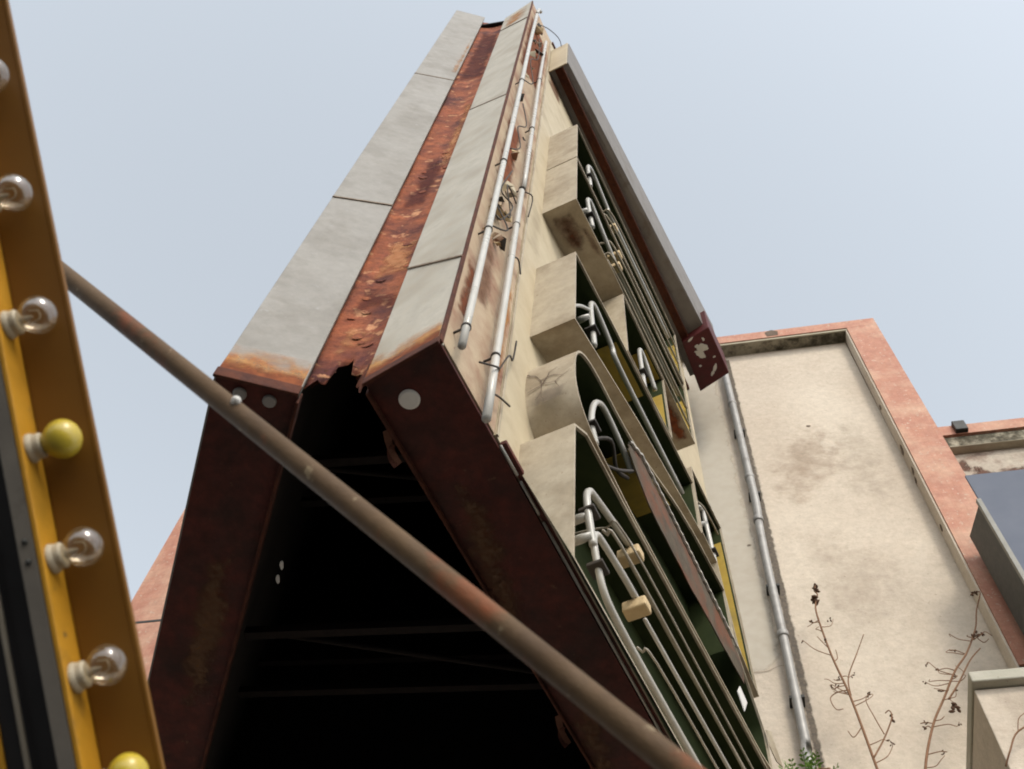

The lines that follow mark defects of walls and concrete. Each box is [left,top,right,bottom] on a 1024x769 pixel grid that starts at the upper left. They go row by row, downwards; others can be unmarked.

rust [456,34,496,79]
rust [406,105,472,207]
rust [376,242,415,282]
rust [459,249,493,316]
rust [220,354,310,386]
rust [365,324,442,377]
crack [527,367,567,400]